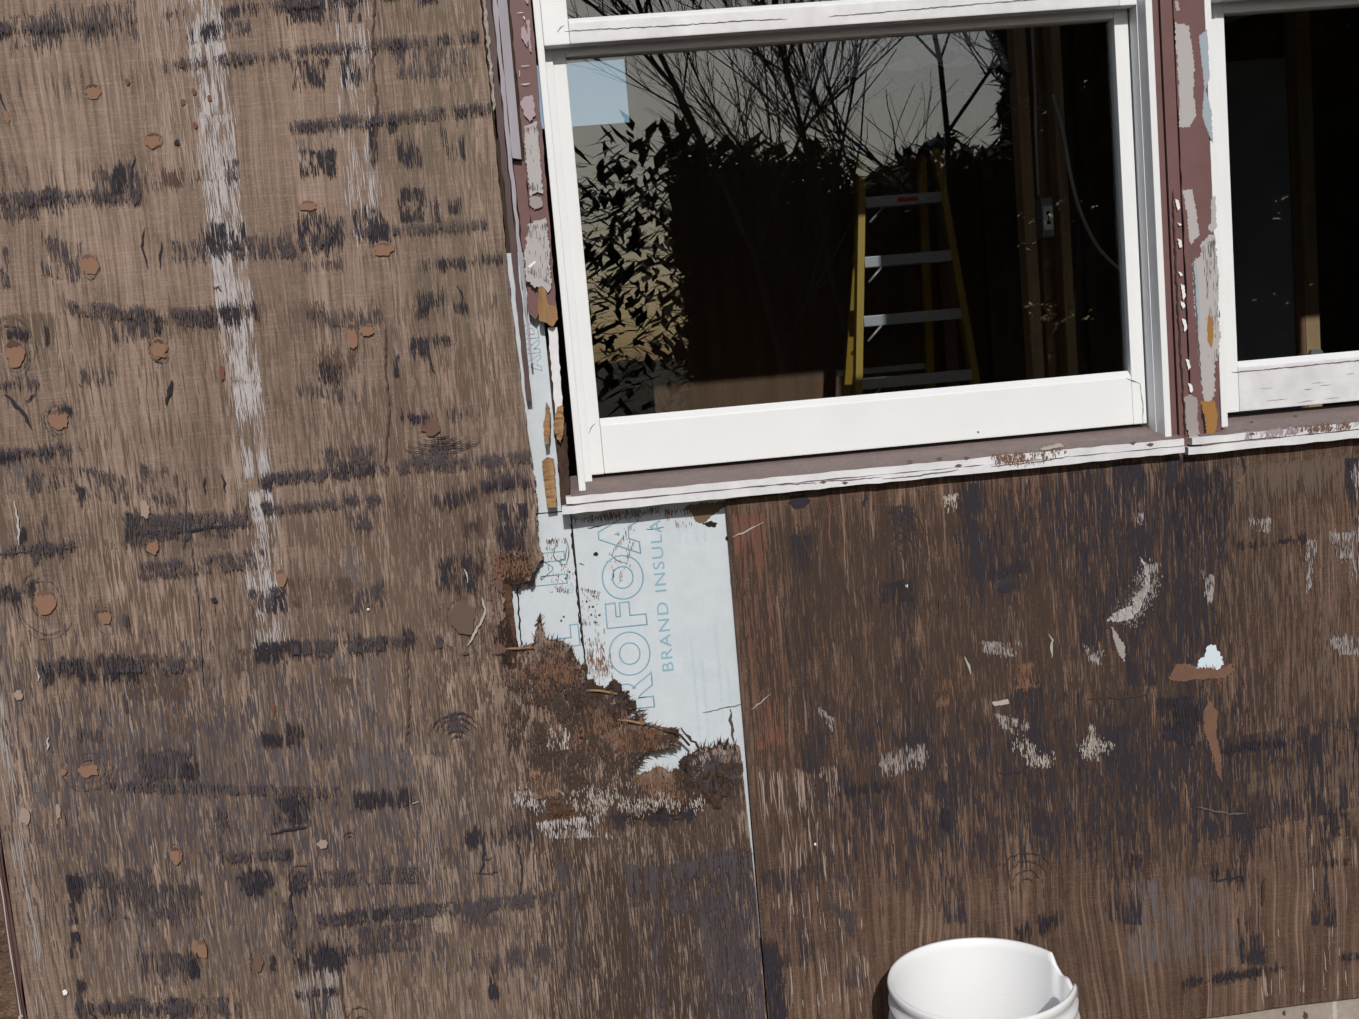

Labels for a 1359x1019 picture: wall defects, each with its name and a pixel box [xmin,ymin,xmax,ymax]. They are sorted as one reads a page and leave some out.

peeling [521,20,531,52]
peeling [1175,1,1213,141]
peeling [520,95,552,293]
peeling [1175,189,1221,437]